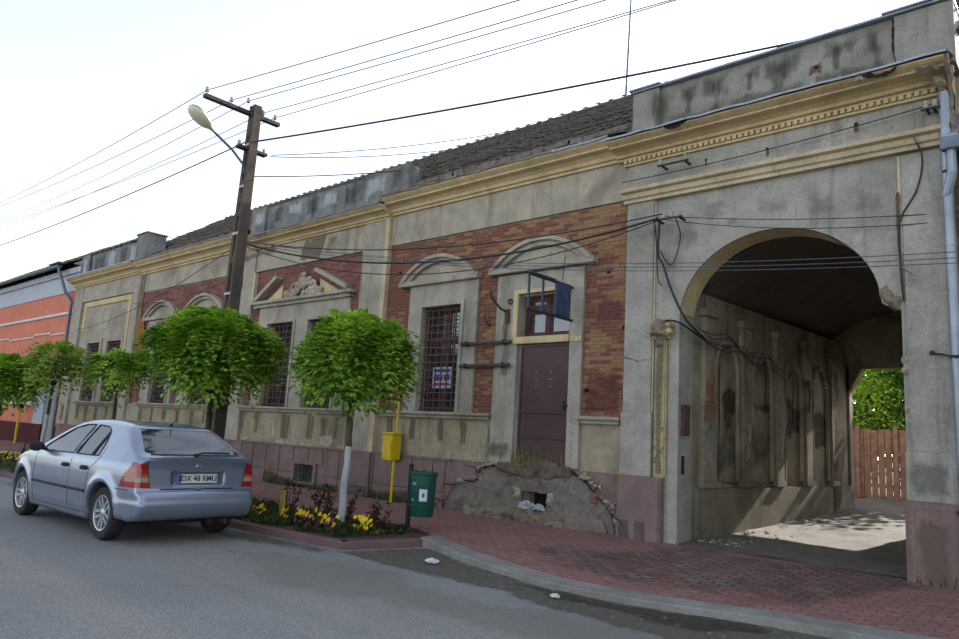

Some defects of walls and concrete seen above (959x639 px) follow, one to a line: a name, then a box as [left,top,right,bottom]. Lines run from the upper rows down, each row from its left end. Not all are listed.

crack [889,19,897,62]
flaking render [879,285,902,309]
flaking render [444,468,616,535]